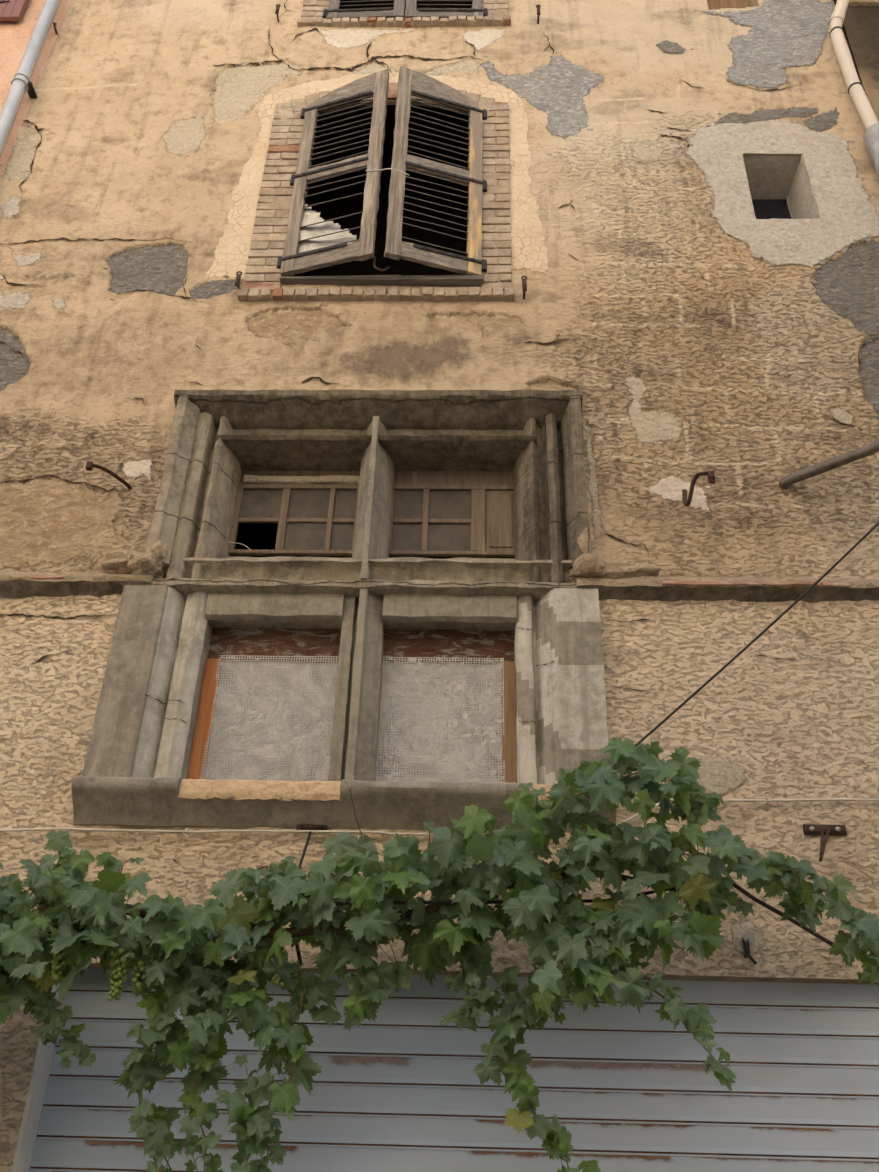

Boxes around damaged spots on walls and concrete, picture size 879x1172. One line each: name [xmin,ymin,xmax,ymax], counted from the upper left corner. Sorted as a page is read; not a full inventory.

crack [214,0,483,73]
spalling [706,107,840,132]
spalling [102,243,243,300]
spalling [0,319,30,392]
spalling [813,240,879,419]
peeling [829,406,860,431]
crack [0,474,117,494]